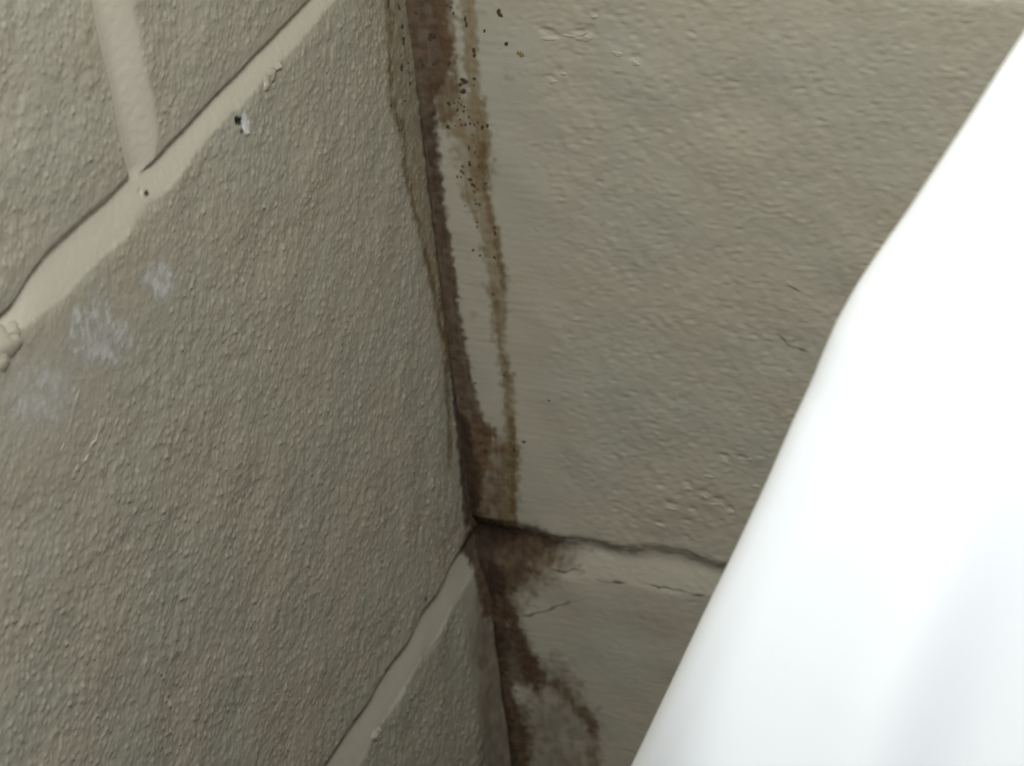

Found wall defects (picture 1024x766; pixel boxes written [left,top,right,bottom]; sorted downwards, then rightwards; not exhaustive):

damp [422,0,506,342]
damp [469,409,526,530]